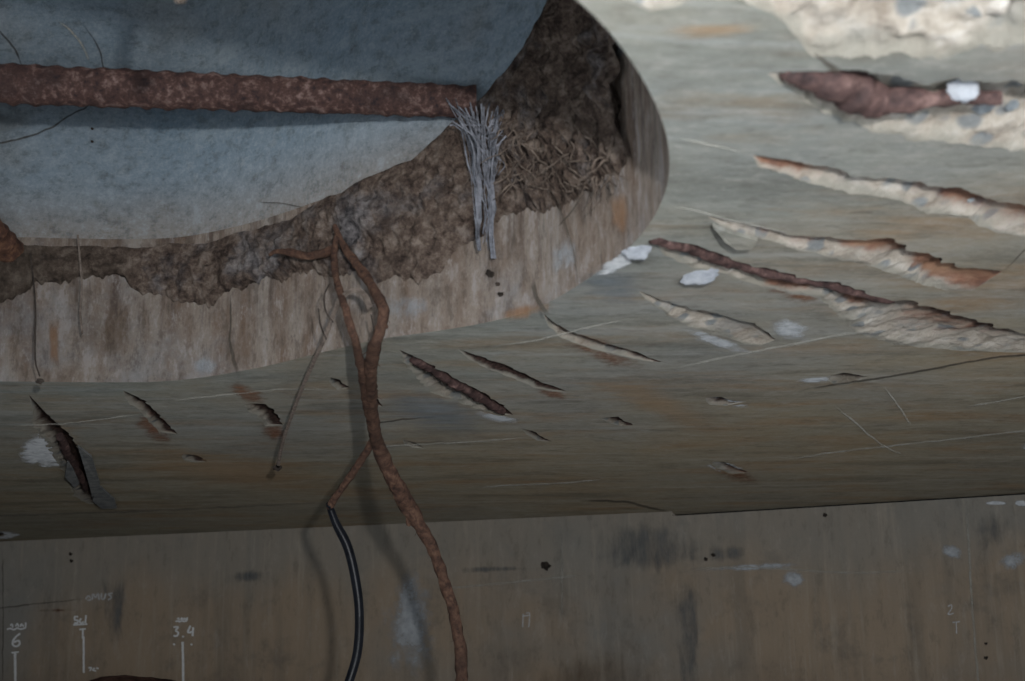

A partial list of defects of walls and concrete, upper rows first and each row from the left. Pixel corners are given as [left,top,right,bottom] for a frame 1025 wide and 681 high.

spalling [624,0,691,11]
spalling [0,63,477,118]
spalling [744,0,1025,151]
spalling [753,155,1025,237]
spalling [0,219,24,262]
spalling [621,216,1025,353]
spalling [399,350,513,415]
spalling [29,395,117,509]